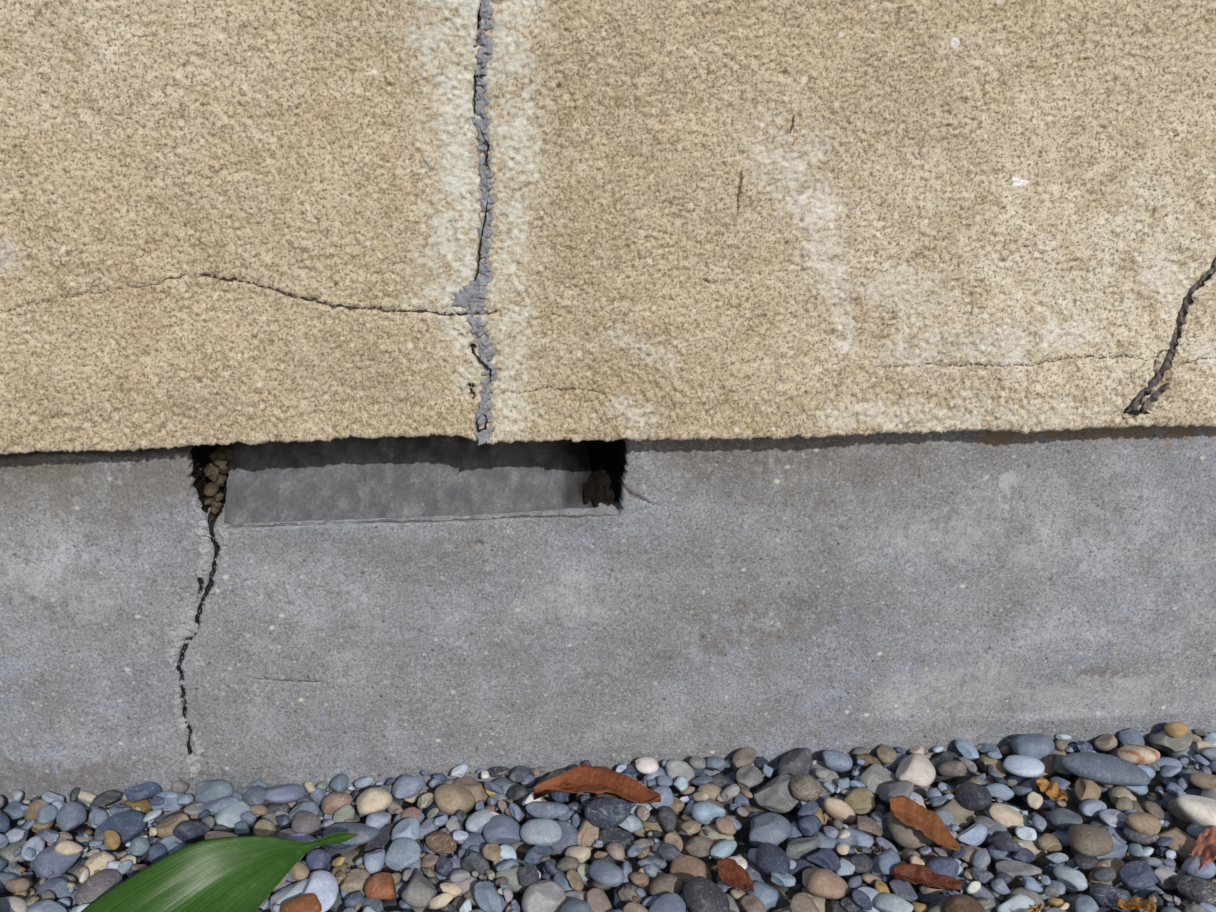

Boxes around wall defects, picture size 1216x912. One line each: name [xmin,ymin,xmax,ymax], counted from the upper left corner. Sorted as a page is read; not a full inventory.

crack [4,0,608,446]
crack [872,258,1216,422]
crack [164,444,655,780]